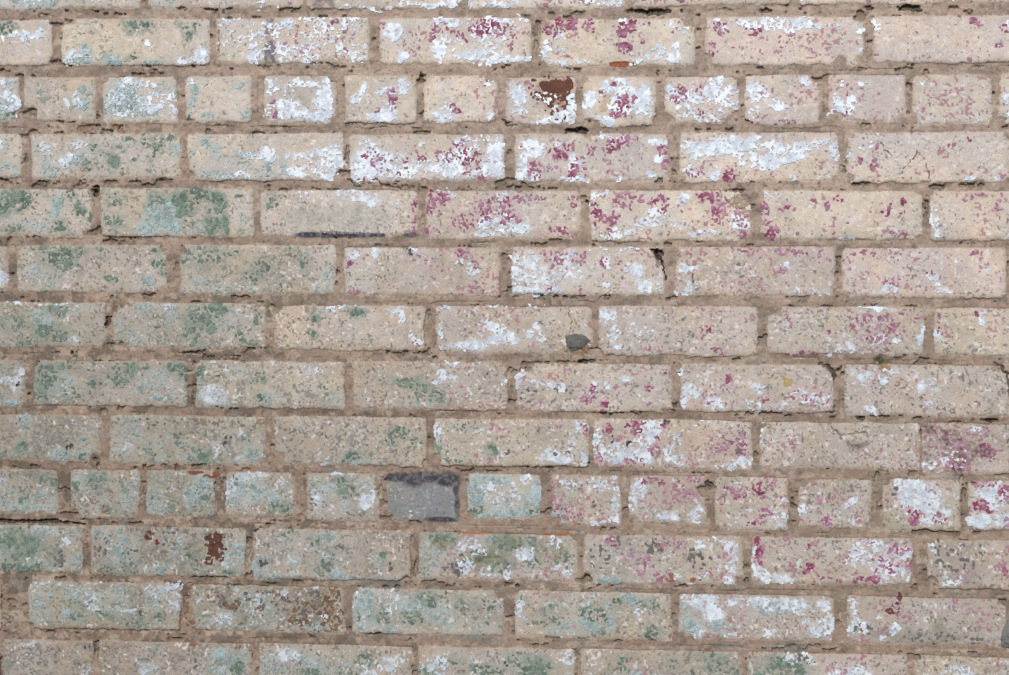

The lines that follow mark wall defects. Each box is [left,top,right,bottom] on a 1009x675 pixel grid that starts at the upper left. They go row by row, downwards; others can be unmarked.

peeling [30,0,881,308]
peeling [929,204,941,238]
peeling [0,359,272,428]
peeling [183,260,271,346]
peeling [379,305,546,406]
peeling [501,369,566,403]
peeling [599,309,654,350]
peeling [664,368,733,426]
peeling [467,381,835,641]
peeling [705,424,913,584]
peeling [884,425,1009,529]
peeling [846,597,933,641]